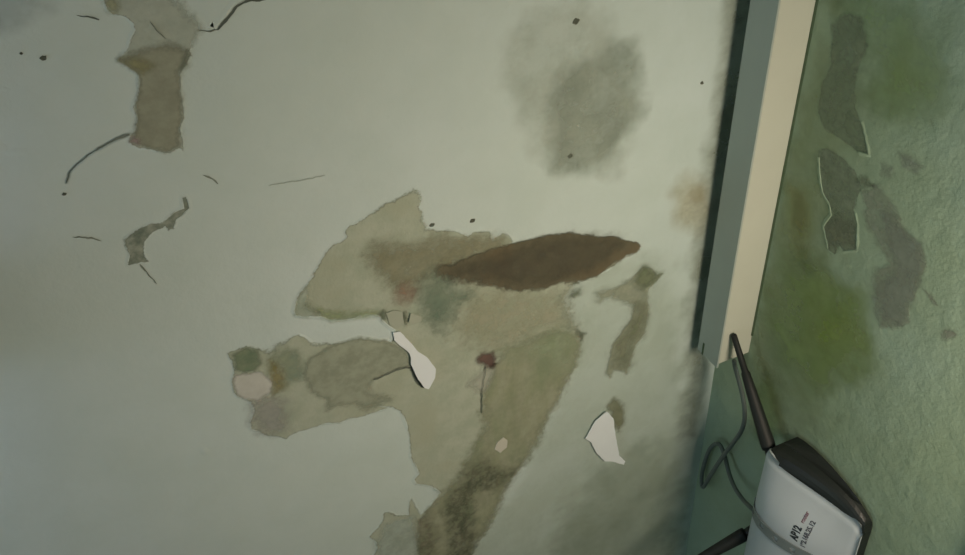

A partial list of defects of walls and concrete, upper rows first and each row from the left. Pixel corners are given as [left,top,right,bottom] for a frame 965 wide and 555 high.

crack [199,0,264,32]
peeling [101,0,199,155]
crack [66,133,136,184]
peeling [122,194,193,284]
water stain [437,232,641,291]
peeling [225,190,642,555]